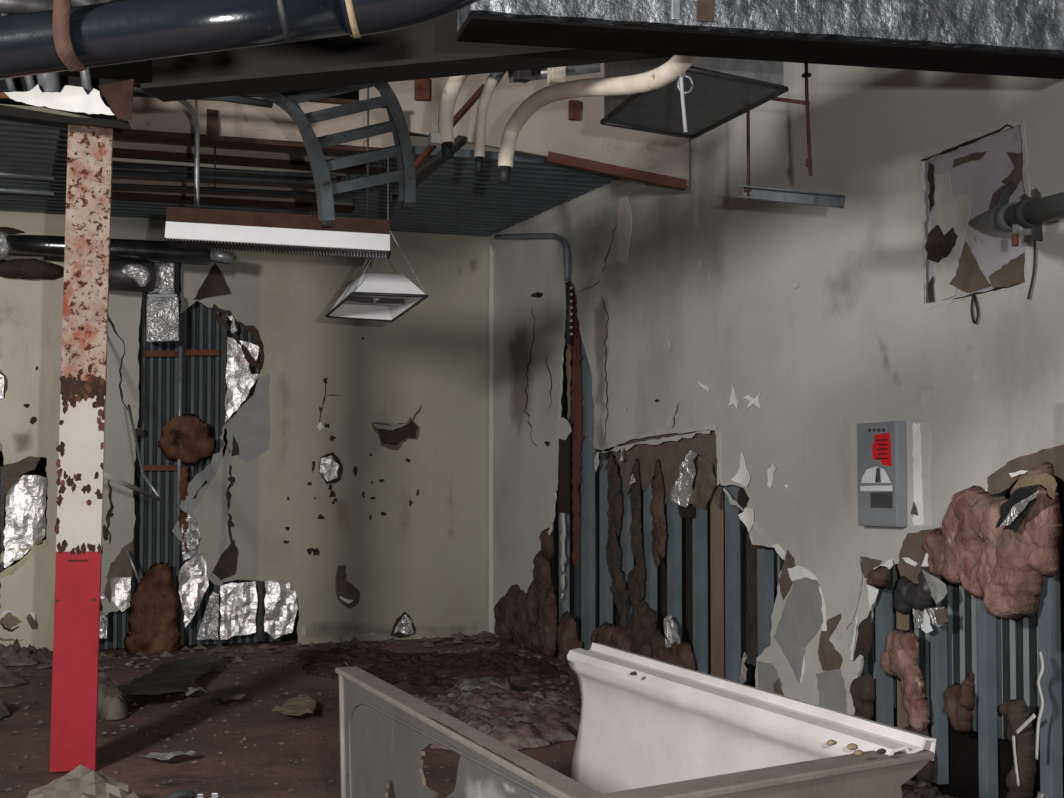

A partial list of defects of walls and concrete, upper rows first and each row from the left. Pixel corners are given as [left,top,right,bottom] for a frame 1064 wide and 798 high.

peeling [4,84,114,383]
crack [108,315,129,413]
corrosion [54,364,106,555]
spalling [172,304,270,555]
spalling [307,407,357,504]
spalling [369,407,421,462]
spalling [594,423,788,560]
flaking render [908,422,932,528]
peeling [0,612,38,632]
peeling [105,541,134,602]